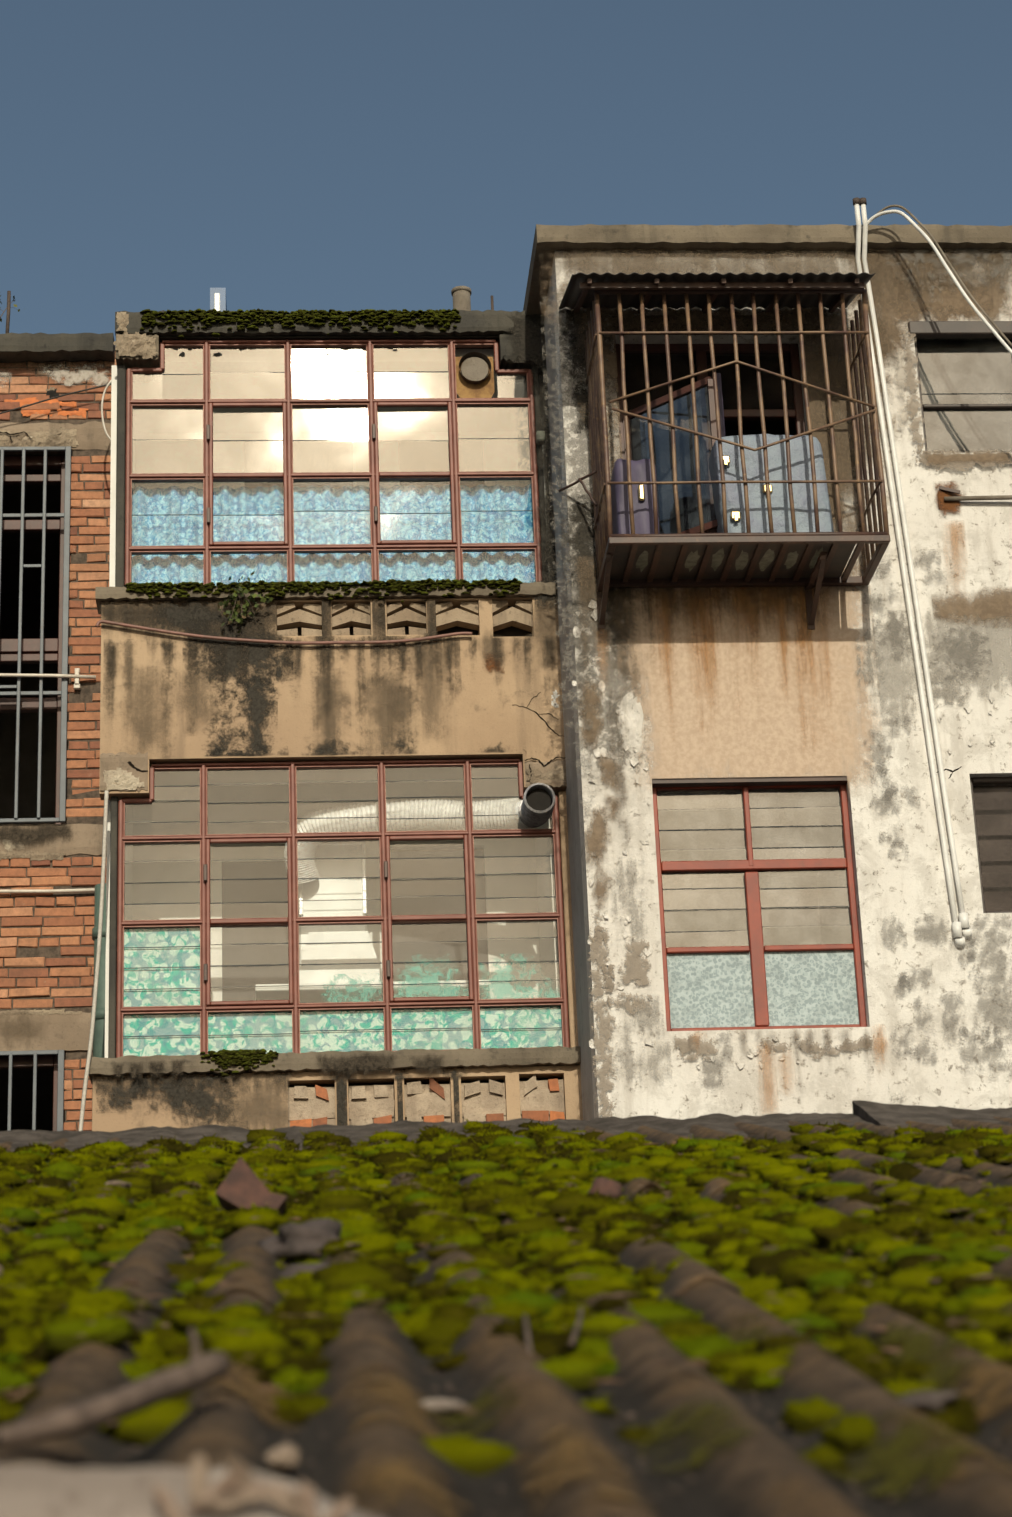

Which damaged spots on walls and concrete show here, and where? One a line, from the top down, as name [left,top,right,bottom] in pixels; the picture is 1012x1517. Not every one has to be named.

damp [101,247,1012,756]
peeling [573,599,598,638]
peeling [588,909,719,1117]
peeling [736,1033,874,1069]